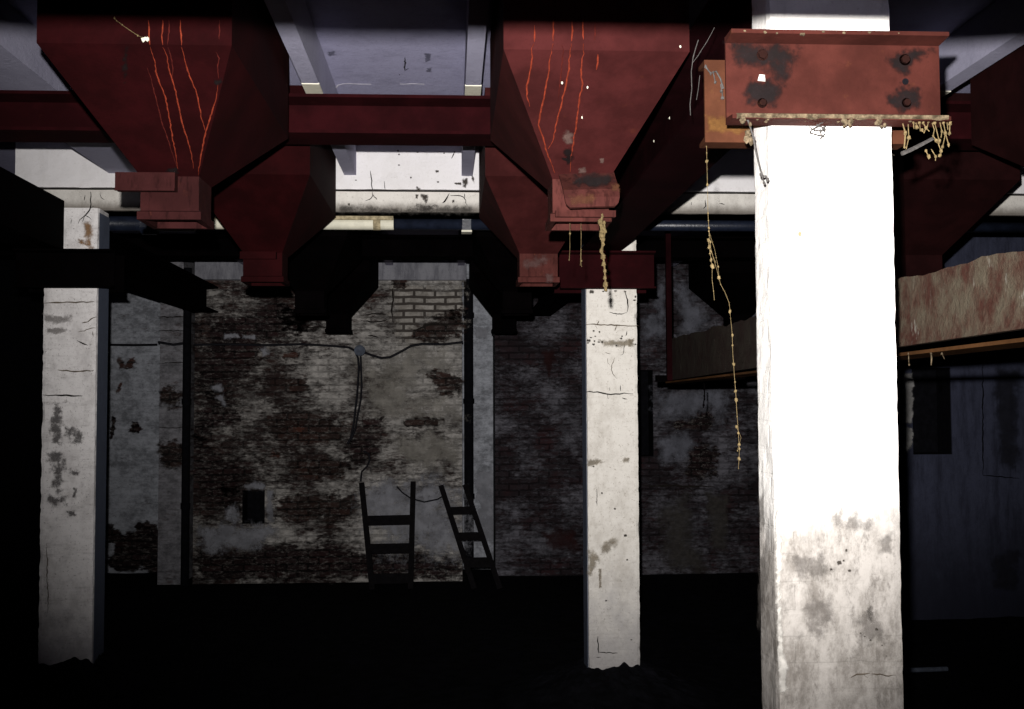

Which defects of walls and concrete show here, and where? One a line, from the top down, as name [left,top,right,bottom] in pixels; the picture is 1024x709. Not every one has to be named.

corrosion [147,20,220,175]
corrosion [526,20,596,173]
corrosion [709,119,746,133]
corrosion [79,223,92,246]
peeling [391,280,408,289]
crack [49,301,95,345]
peeling [412,305,468,343]
crack [45,370,93,397]
peeling [426,369,464,398]
peeling [403,416,445,428]
mould [47,407,82,516]